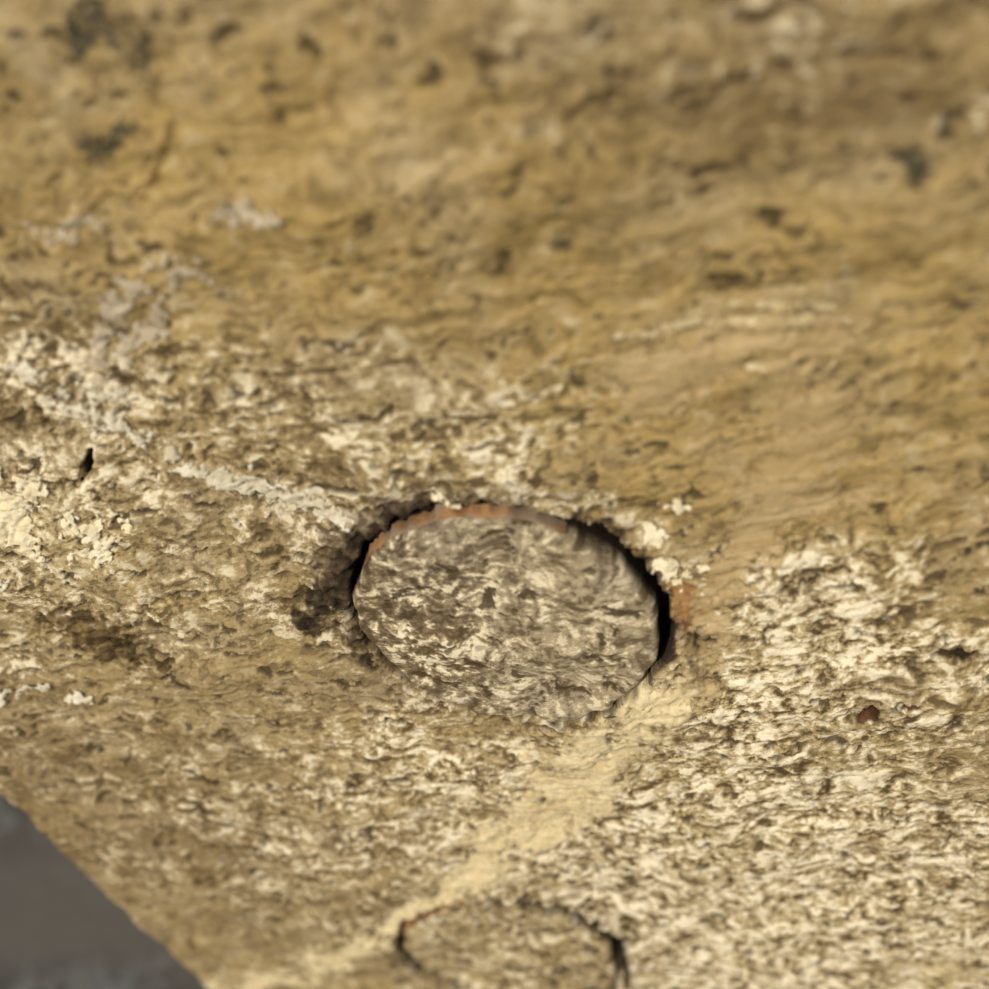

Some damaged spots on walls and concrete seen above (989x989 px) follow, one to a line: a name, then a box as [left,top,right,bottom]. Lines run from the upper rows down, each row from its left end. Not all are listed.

peeling [199,307,885,989]
rust [664,578,705,634]